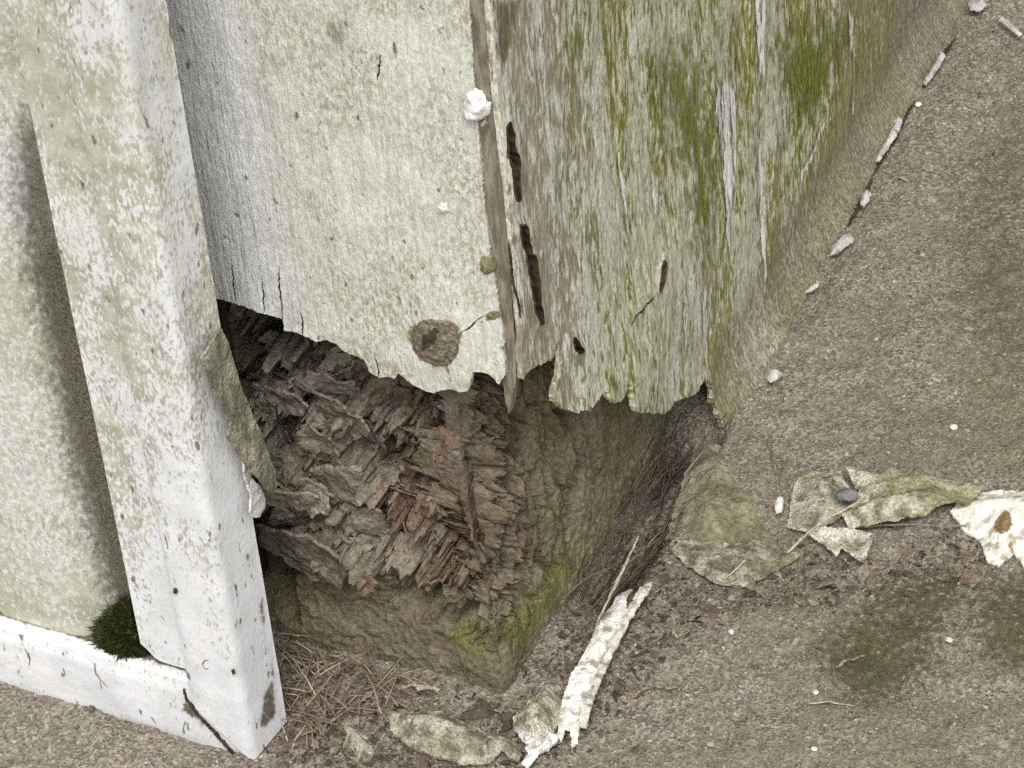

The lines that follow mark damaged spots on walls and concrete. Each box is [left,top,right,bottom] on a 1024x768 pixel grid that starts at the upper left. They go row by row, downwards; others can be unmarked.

damp [499,0,517,61]
crack [506,120,545,325]
damp [614,121,629,233]
damp [634,0,856,279]
spalling [408,319,462,367]
crack [632,259,668,325]
spalling [199,326,451,597]
damp [445,558,574,666]